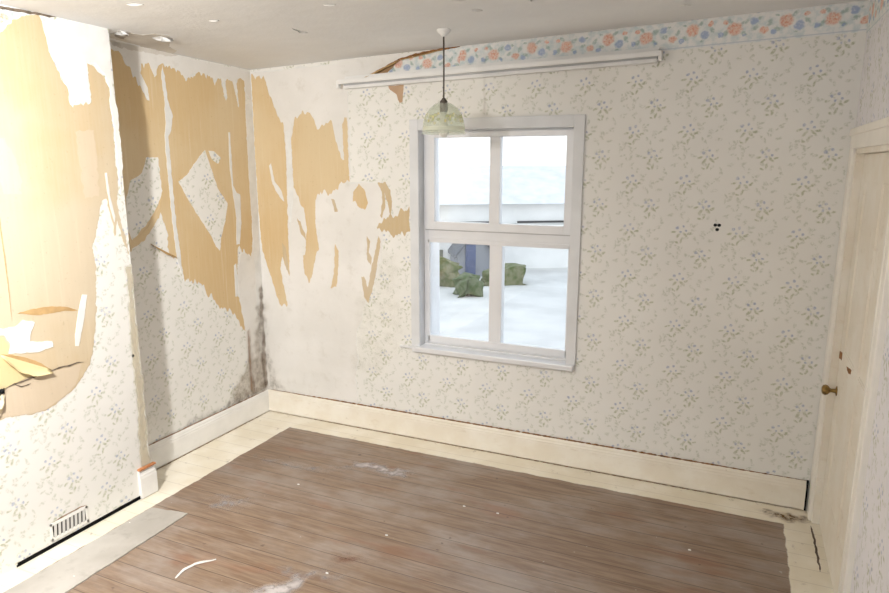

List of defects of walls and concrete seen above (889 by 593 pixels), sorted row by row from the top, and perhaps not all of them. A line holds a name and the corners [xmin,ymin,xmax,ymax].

peeling [0,320,53,417]
flaking render [250,64,410,404]